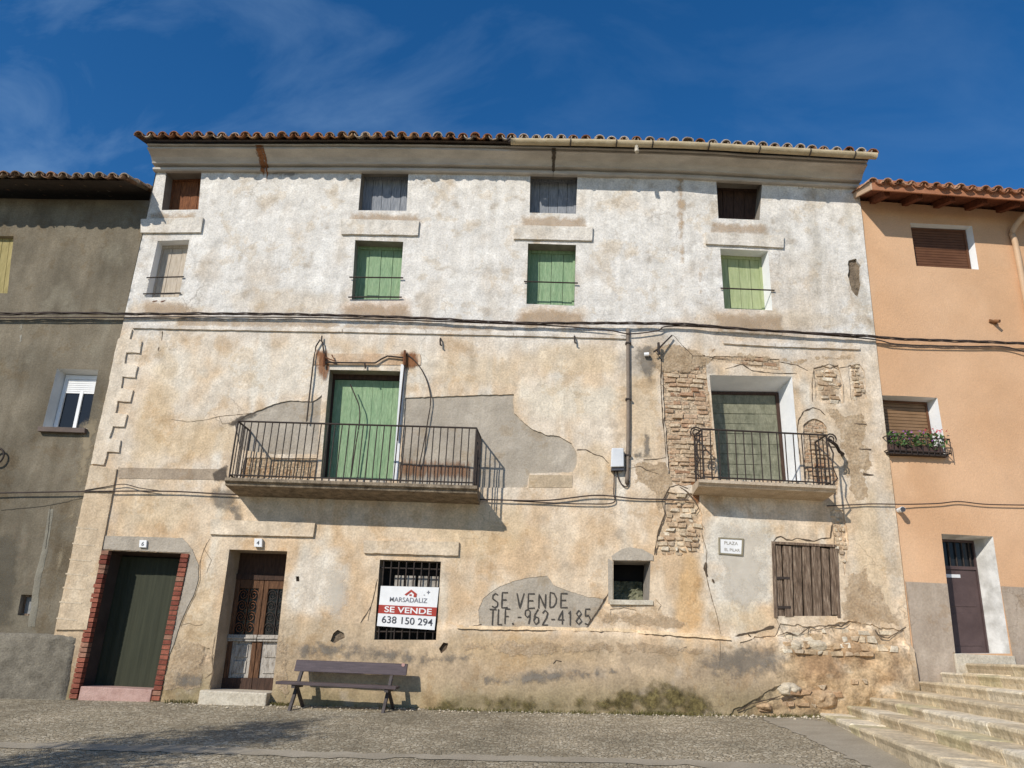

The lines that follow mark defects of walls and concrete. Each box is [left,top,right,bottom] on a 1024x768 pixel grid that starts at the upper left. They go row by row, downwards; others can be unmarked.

rust [255,145,269,177]
rust [401,352,418,368]
spalling [399,394,577,488]
crack [632,335,853,656]
flaking render [634,344,872,556]
spalling [729,510,915,717]